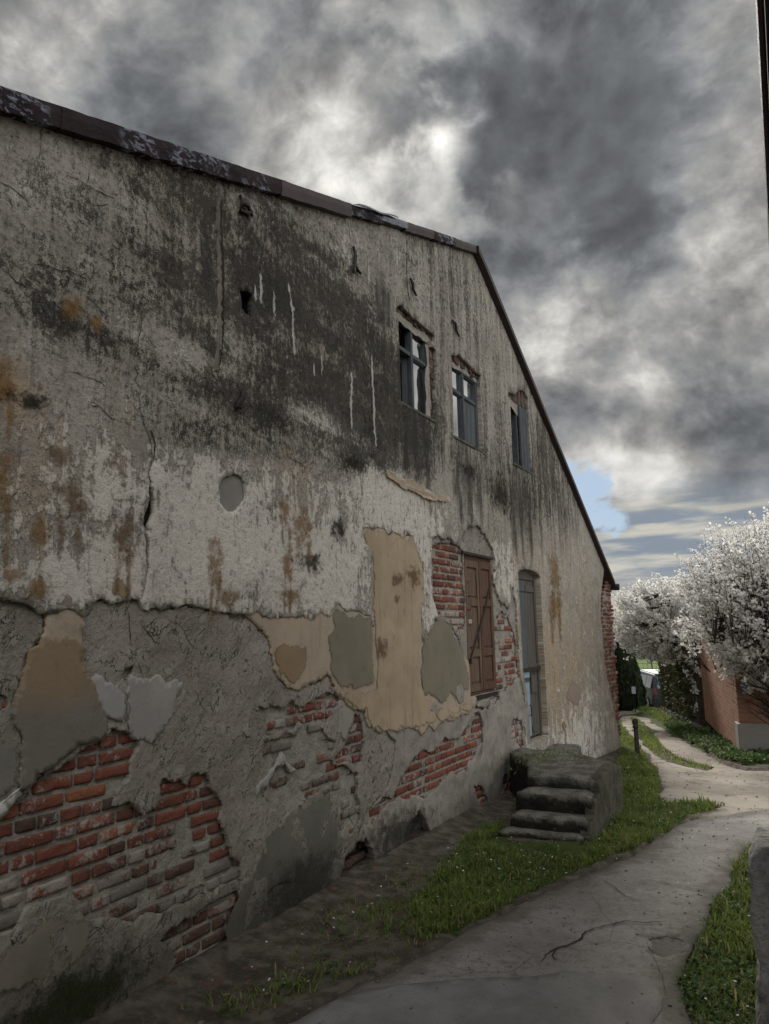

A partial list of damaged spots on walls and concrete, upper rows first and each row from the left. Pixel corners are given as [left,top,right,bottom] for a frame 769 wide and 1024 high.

spalling [240,292,249,314]
leakage [254,273,276,315]
leakage [288,283,296,356]
leakage [340,453,367,474]
corrosion [0,453,53,598]
corrosion [59,481,87,549]
corrosion [114,517,132,597]
crack [143,500,151,552]
corrosion [208,537,240,628]
corrosion [279,500,313,616]
spalling [0,526,519,1024]
crack [541,879,704,990]